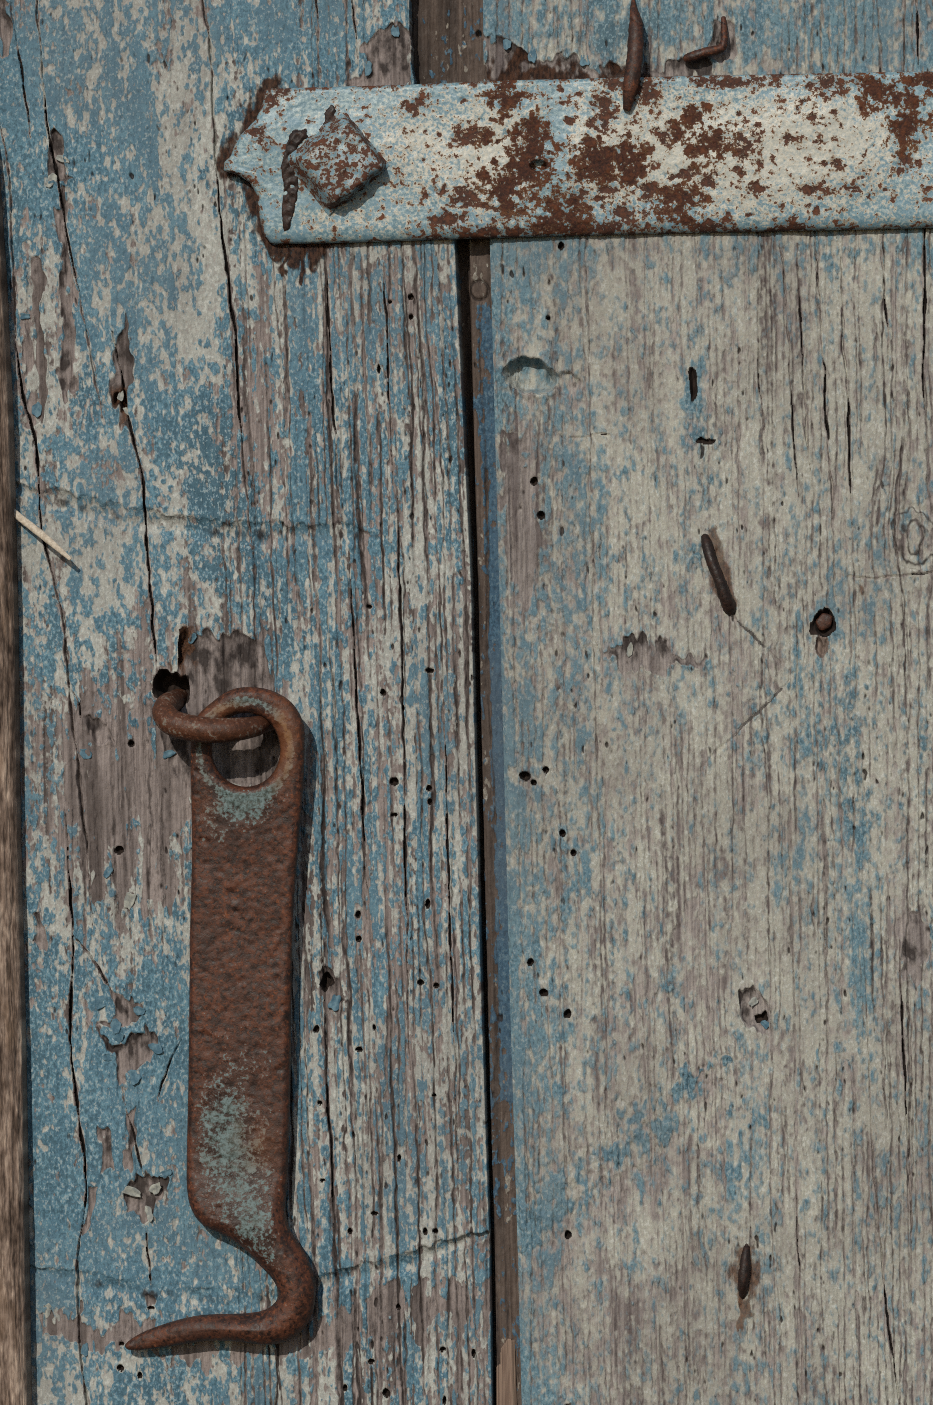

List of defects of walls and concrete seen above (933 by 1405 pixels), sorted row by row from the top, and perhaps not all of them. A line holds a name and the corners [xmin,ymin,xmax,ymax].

crack [17,50,77,281]
rust [216,74,347,285]
peeling [348,22,411,86]
rust [467,48,740,236]
rust [852,71,933,158]
crack [217,181,242,433]
crack [121,370,157,662]
spalling [178,626,197,664]
peeling [56,682,192,920]
crack [67,847,108,1208]
peeling [94,987,163,1086]
peeling [82,1106,172,1236]